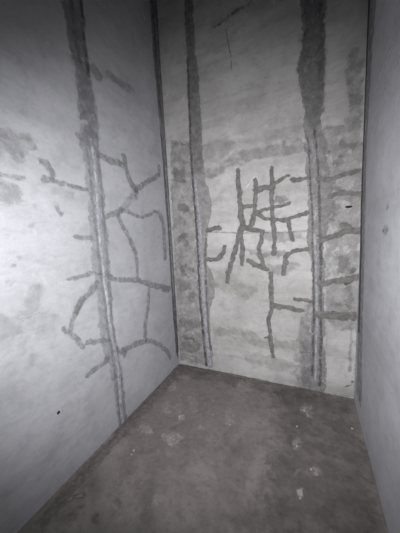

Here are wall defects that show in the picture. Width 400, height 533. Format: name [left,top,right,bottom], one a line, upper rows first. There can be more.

crack [40,160,88,191]
crack [62,208,170,378]
crack [96,153,160,192]
flaking render [171,142,204,364]
crack [205,166,361,358]
flaking render [325,126,361,313]